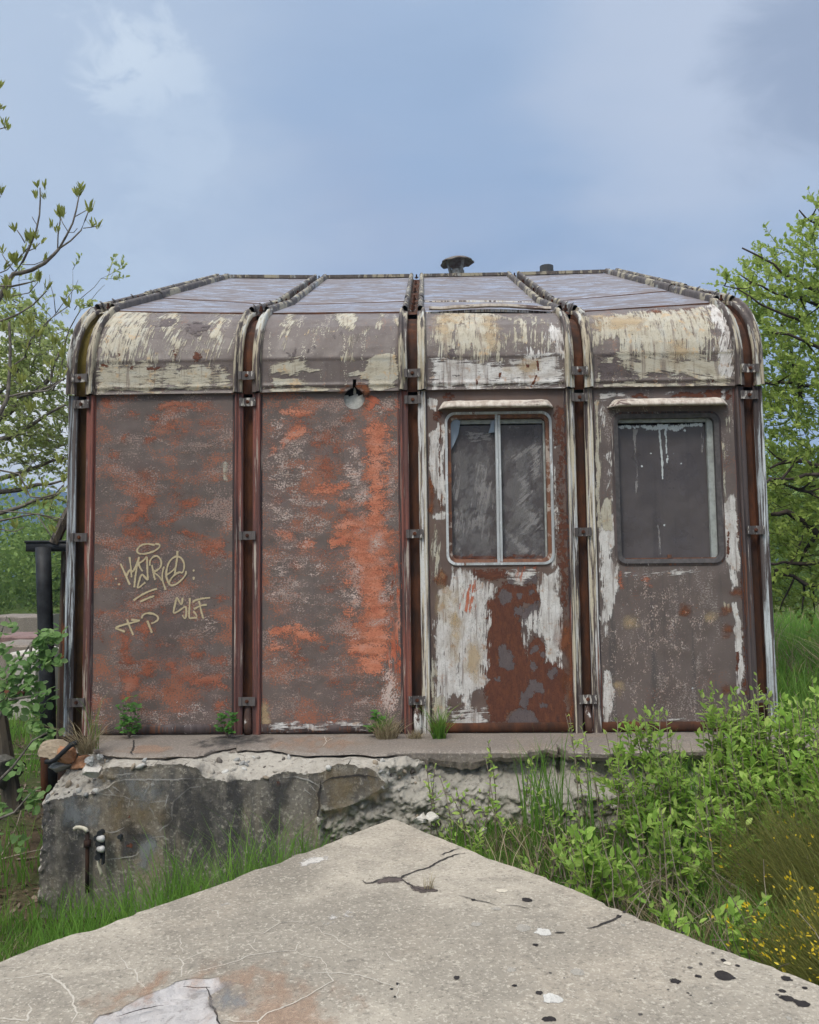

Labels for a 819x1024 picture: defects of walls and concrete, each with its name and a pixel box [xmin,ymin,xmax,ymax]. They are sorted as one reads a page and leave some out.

peeling [95,311,236,567]
peeling [262,313,402,731]
peeling [426,313,565,723]
peeling [588,304,745,722]
spalling [42,751,708,847]
crack [363,849,527,908]